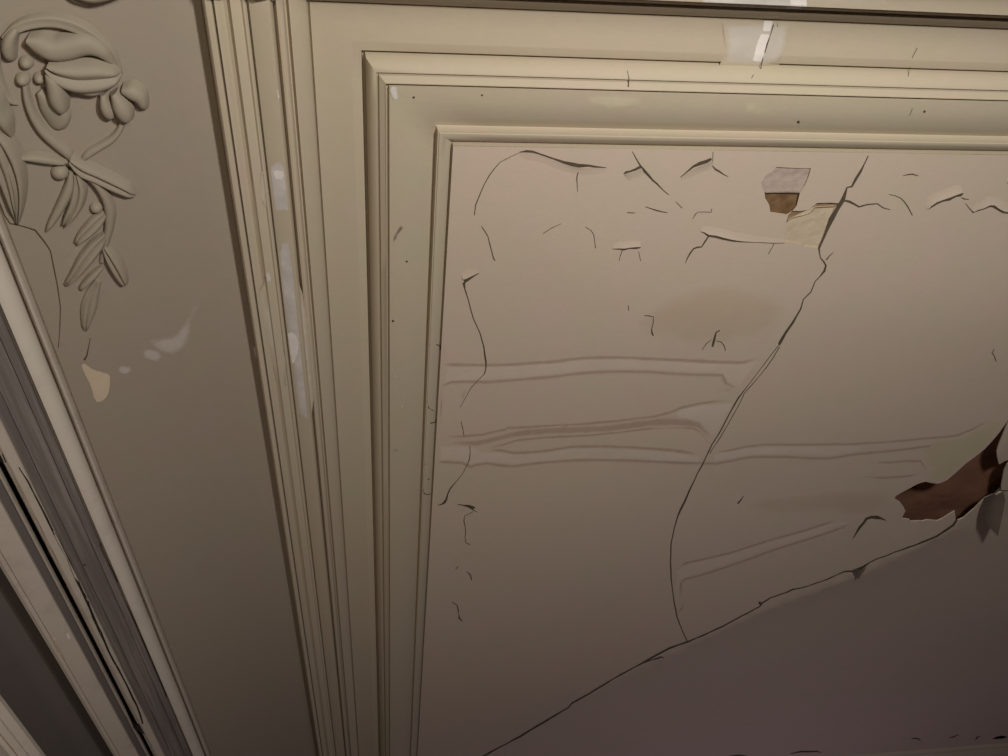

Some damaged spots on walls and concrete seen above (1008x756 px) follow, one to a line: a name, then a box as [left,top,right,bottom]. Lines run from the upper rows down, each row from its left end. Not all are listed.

peeling [81,363,110,403]
crack [423,150,785,545]
crack [483,141,1008,756]
peeling [761,167,838,247]
crack [0,453,154,756]
crack [99,544,167,697]